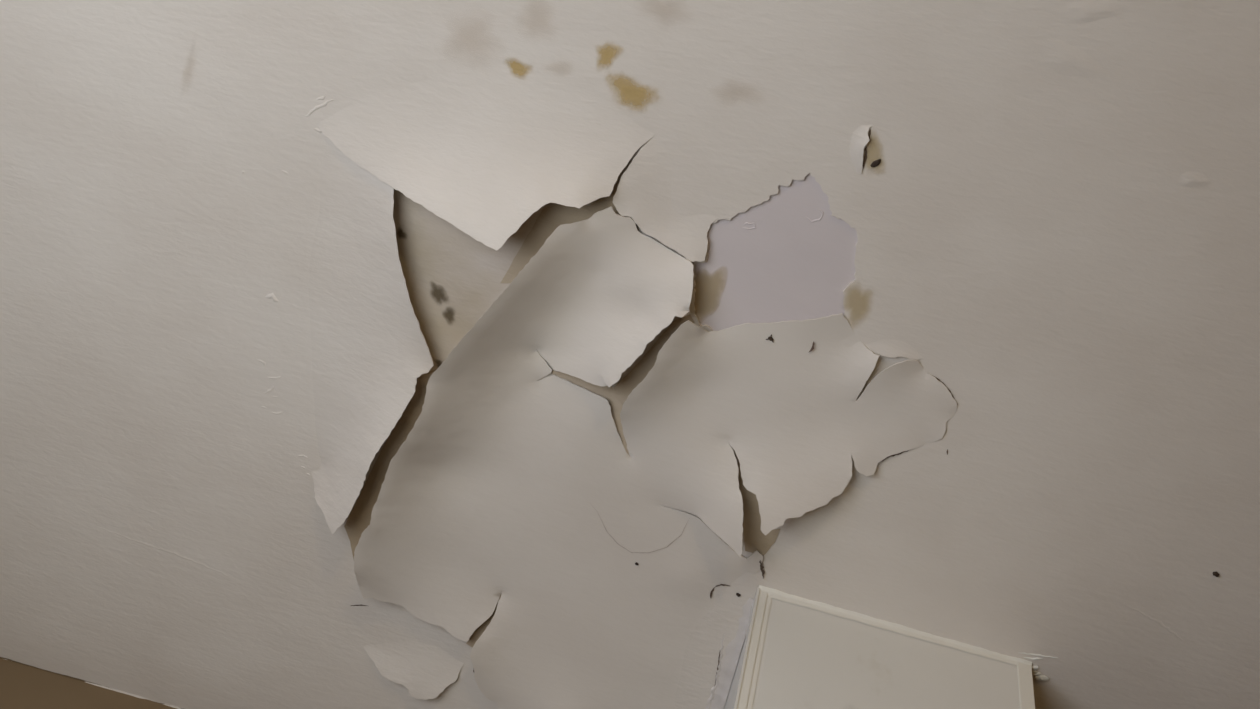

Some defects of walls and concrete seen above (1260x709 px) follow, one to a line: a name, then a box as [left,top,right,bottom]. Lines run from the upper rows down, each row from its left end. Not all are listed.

peeling [309,67,957,709]